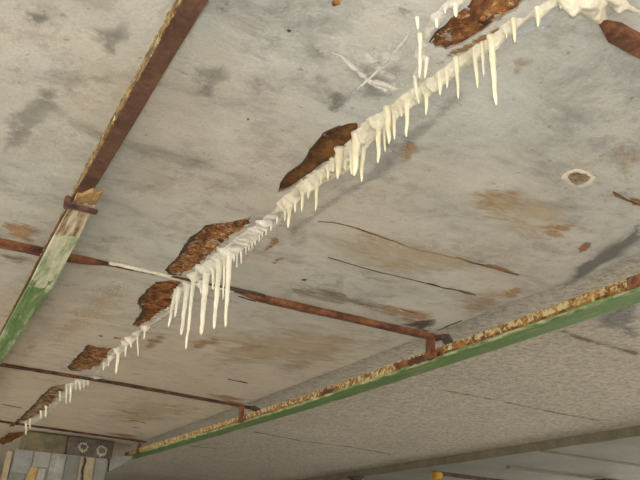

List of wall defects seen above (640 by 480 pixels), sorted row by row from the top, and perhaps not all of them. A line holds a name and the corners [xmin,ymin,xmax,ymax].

spalling [429,0,521,47]
spalling [279,123,358,190]
leakage [96,0,640,374]
spalling [561,169,596,187]
spalling [133,218,250,326]
crack [318,221,520,276]
corrosion [435,273,640,356]
spalling [67,345,112,371]
corrosion [395,353,426,371]
spalling [0,383,66,445]
leakage [23,375,104,434]